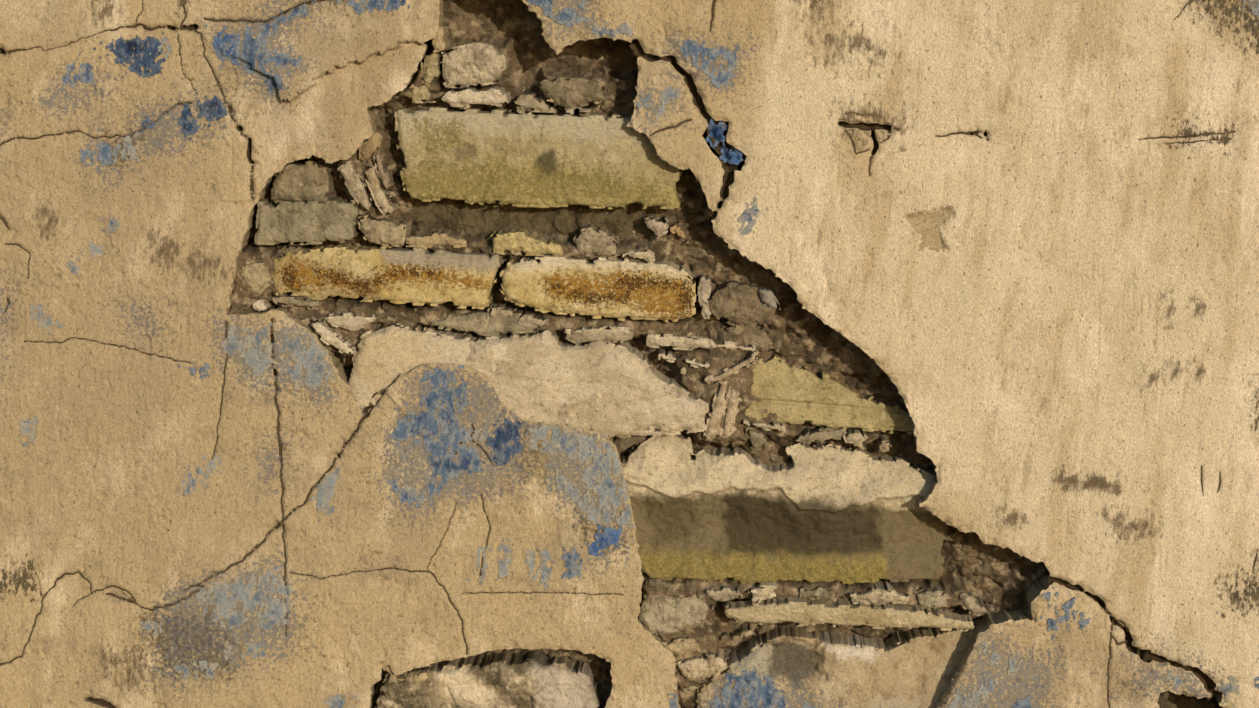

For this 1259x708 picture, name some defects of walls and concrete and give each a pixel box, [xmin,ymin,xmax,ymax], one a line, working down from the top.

crack [0,0,327,201]
spalling [1138,131,1236,145]
crack [0,217,31,313]
peeling [0,266,65,447]
peeling [100,284,175,353]
spalling [177,0,1097,708]
crack [0,319,624,665]
spalling [1083,635,1240,708]